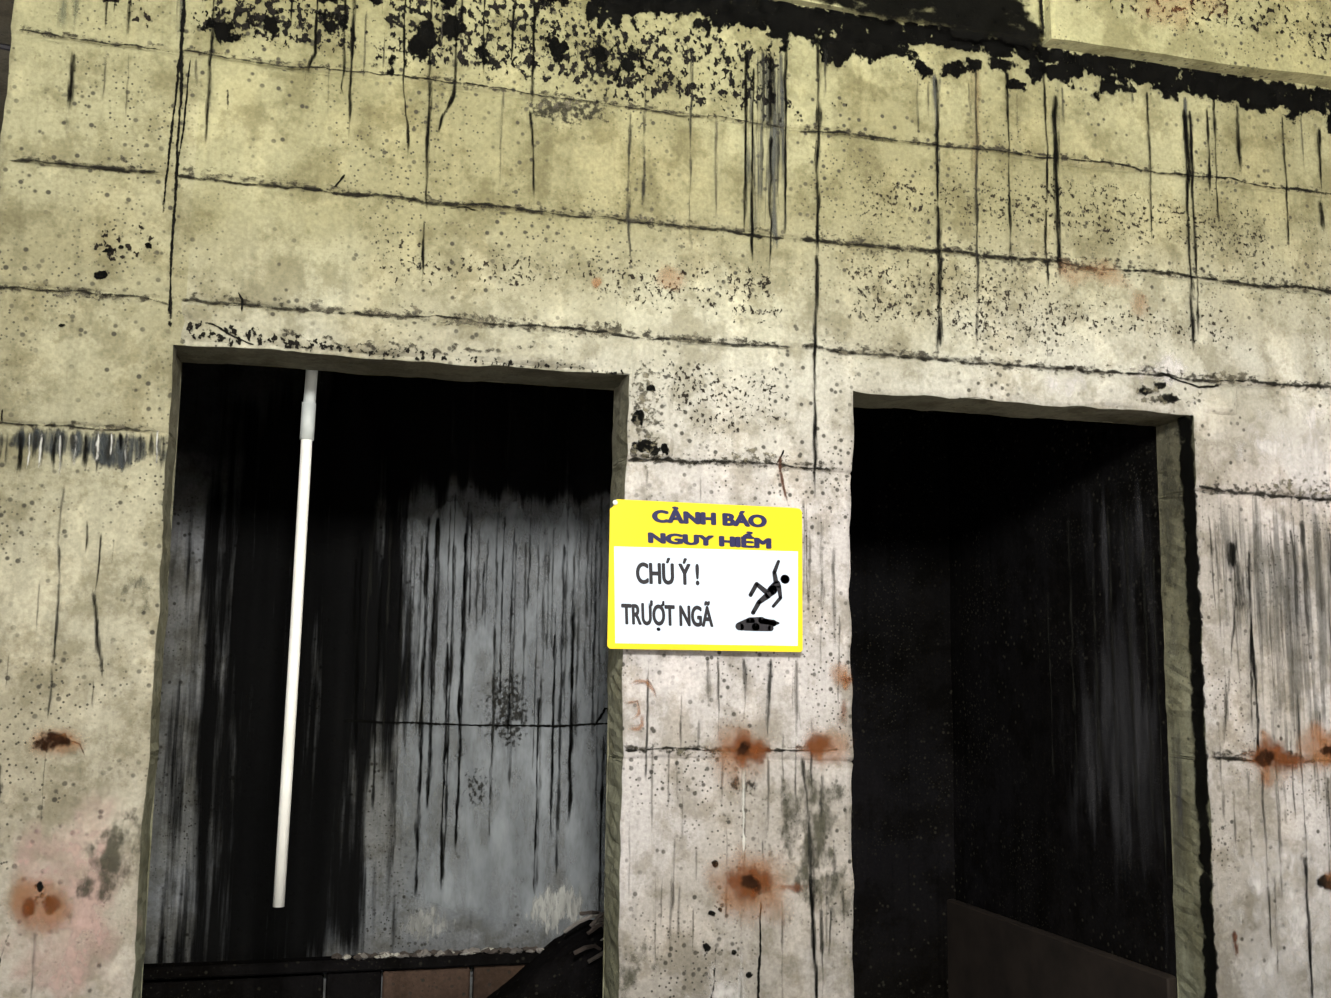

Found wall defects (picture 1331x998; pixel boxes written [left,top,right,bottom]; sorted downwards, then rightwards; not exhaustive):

crack [0,0,1331,390]
damp [191,0,1331,482]
crack [0,409,151,432]
damp [0,428,165,471]
crack [628,448,837,471]
crack [1199,479,1331,503]
damp [86,525,103,698]
damp [156,371,614,981]
corrosion [33,732,84,753]
corrosion [1254,728,1331,780]
corrosion [726,864,800,904]
corrosion [1317,874,1331,889]